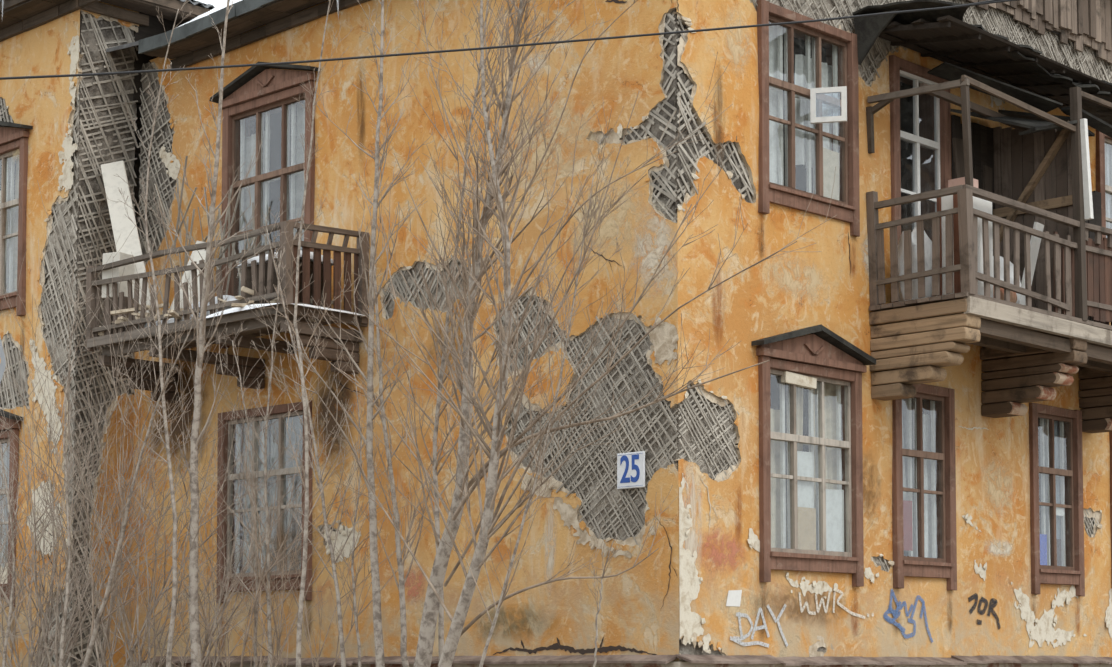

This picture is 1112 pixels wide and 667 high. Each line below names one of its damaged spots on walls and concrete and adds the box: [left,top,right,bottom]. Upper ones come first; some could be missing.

flaking render [749,0,909,34]
flaking render [858,37,907,87]
flaking render [942,0,1112,83]
flaking render [586,7,756,223]
flaking render [379,255,485,320]
flaking render [0,9,181,667]
flaking render [491,287,741,661]
peeling [1011,582,1087,648]